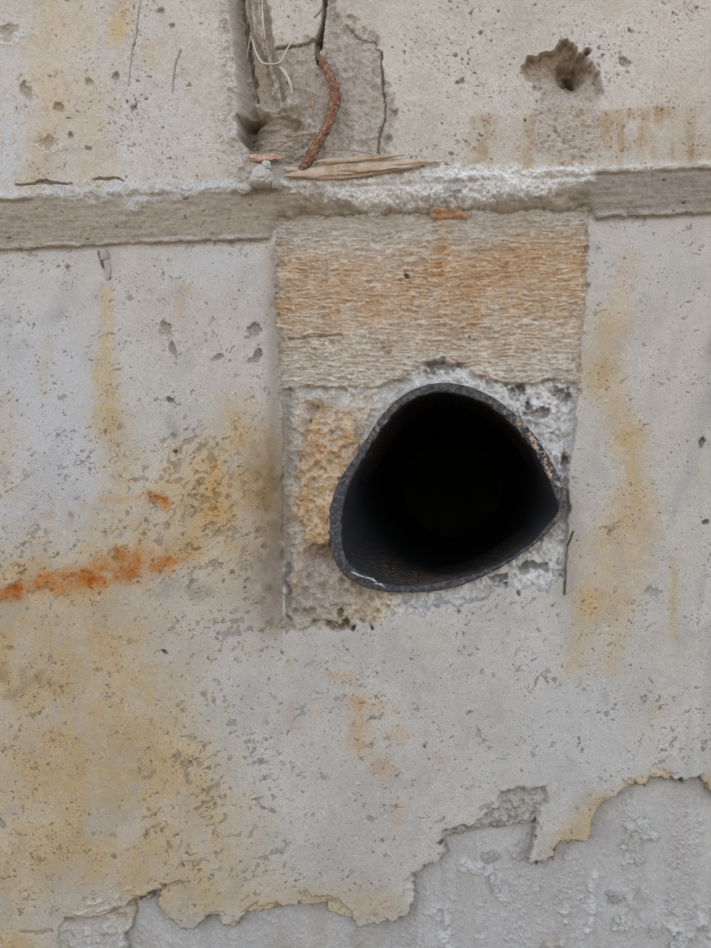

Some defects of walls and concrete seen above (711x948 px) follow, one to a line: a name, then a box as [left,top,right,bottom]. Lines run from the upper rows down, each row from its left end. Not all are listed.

spalling [217,0,399,185]
corrosion [299,53,341,171]
crack [274,0,388,155]
spalling [519,36,605,163]
spalling [276,359,578,635]
flaking render [0,763,711,948]